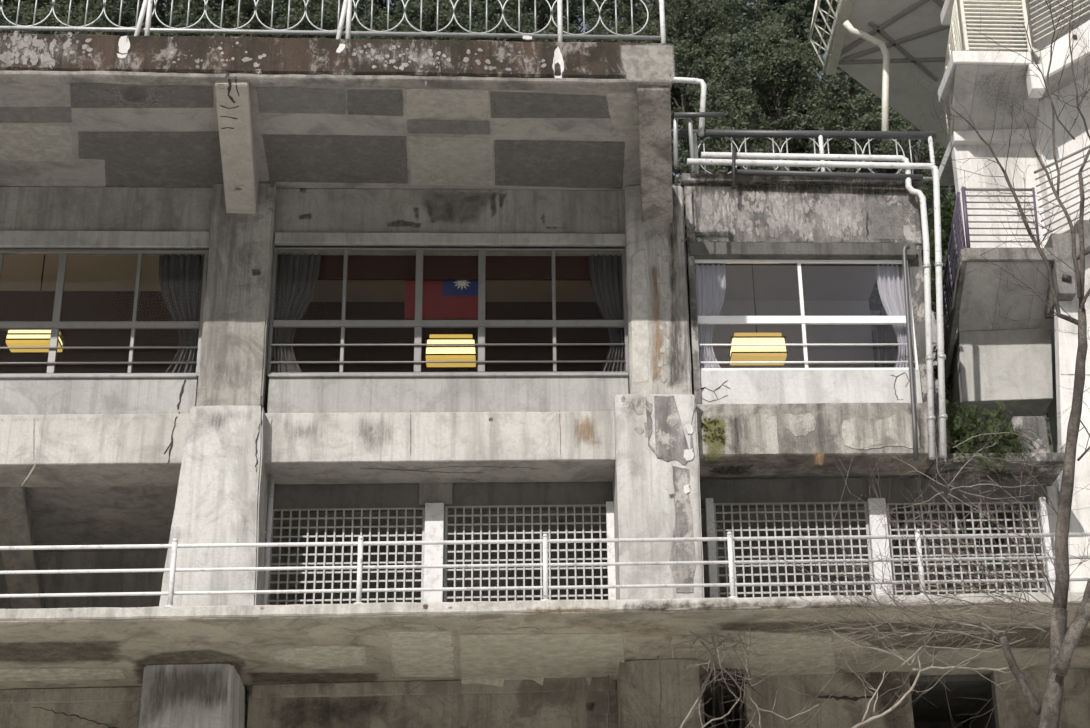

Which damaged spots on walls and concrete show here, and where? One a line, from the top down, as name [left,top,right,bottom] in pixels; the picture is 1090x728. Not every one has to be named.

peeling [0,31,93,69]
peeling [117,36,130,59]
crack [218,72,239,129]
damp [257,87,625,227]
corrosion [653,268,661,376]
flaking render [655,189,865,383]
crack [164,380,186,463]
crack [255,396,264,472]
flaking render [744,413,817,455]
flaking render [842,410,920,450]
flaking render [621,392,697,593]
crack [33,707,117,728]